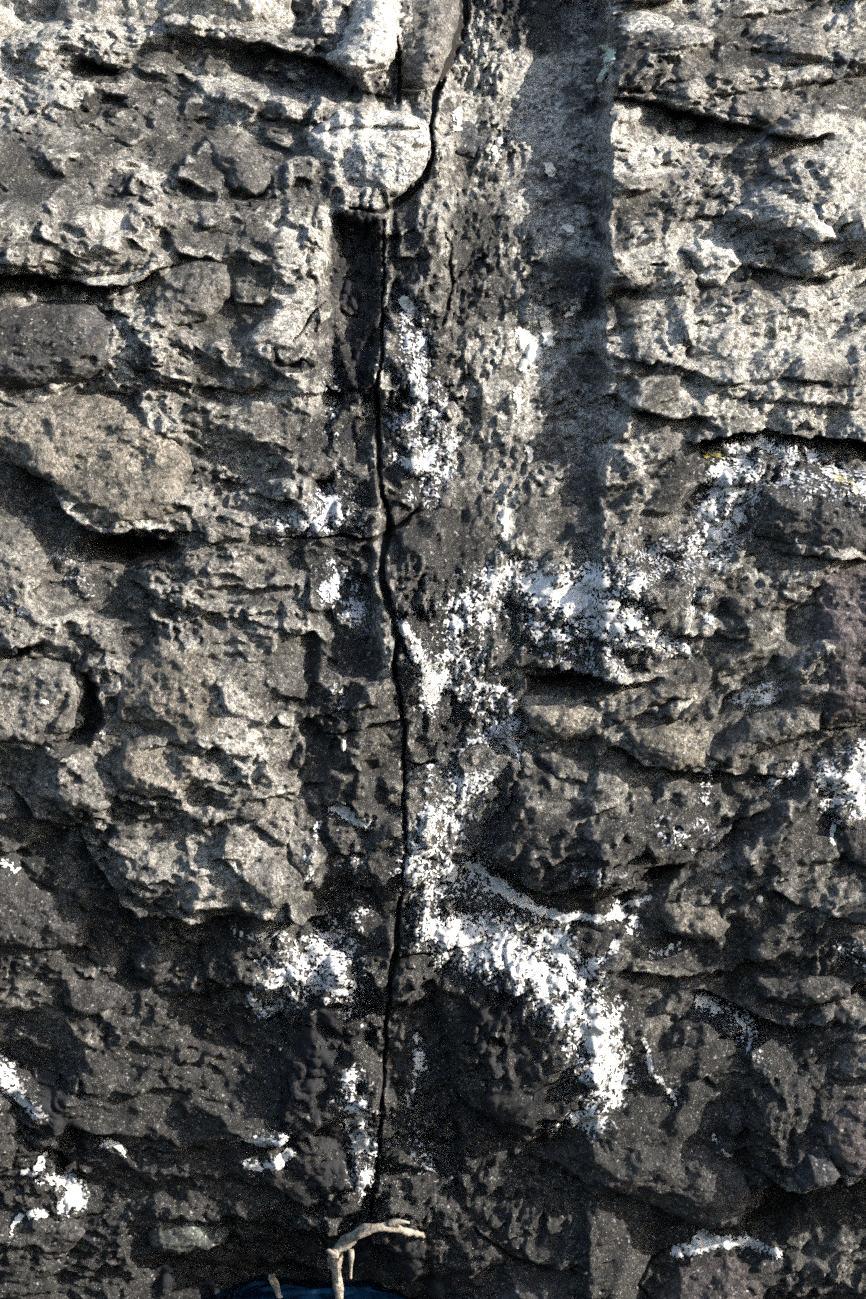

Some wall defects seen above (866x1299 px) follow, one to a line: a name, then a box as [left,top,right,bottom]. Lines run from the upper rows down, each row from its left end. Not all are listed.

crack [284,0,469,1212]